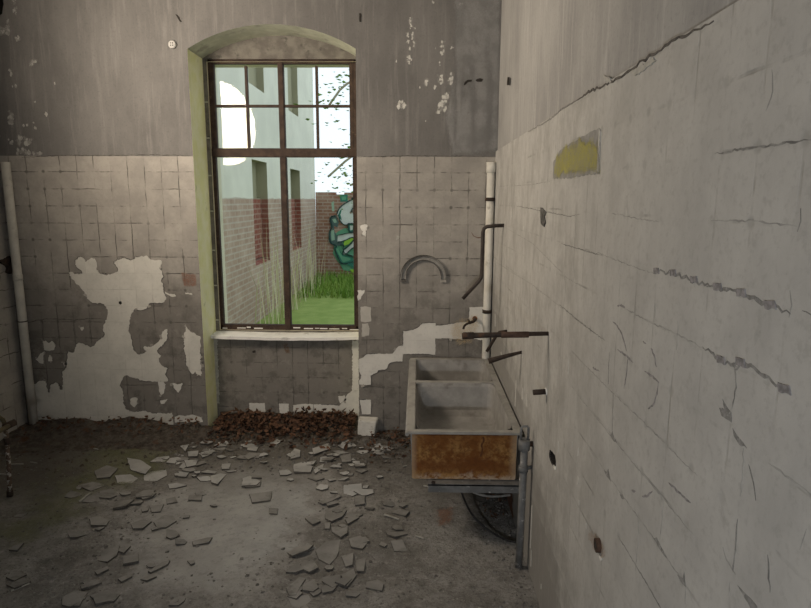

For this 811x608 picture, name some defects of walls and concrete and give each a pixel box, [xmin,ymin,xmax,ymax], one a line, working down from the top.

crack [528,20,714,132]
crack [715,139,811,154]
crack [711,208,801,232]
peeling [34,256,204,425]
peeling [279,290,483,418]
crack [577,360,696,534]
crack [740,448,811,501]
crack [723,519,738,596]